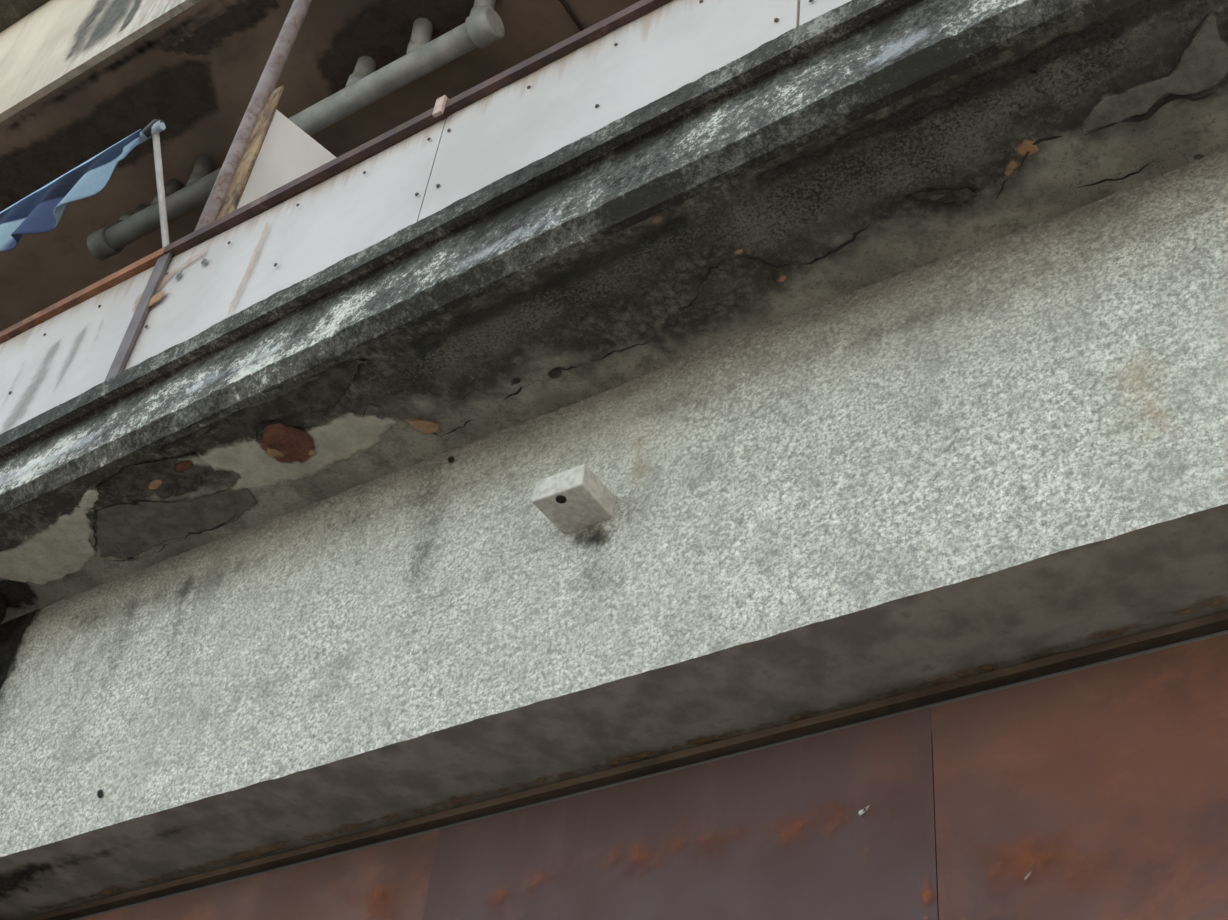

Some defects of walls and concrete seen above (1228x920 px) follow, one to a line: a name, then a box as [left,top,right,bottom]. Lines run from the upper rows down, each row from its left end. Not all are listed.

damp [67,0,141,58]
damp [89,41,154,81]
crack [1078,143,1211,188]
corrosion [256,418,316,463]
peeling [0,413,439,585]